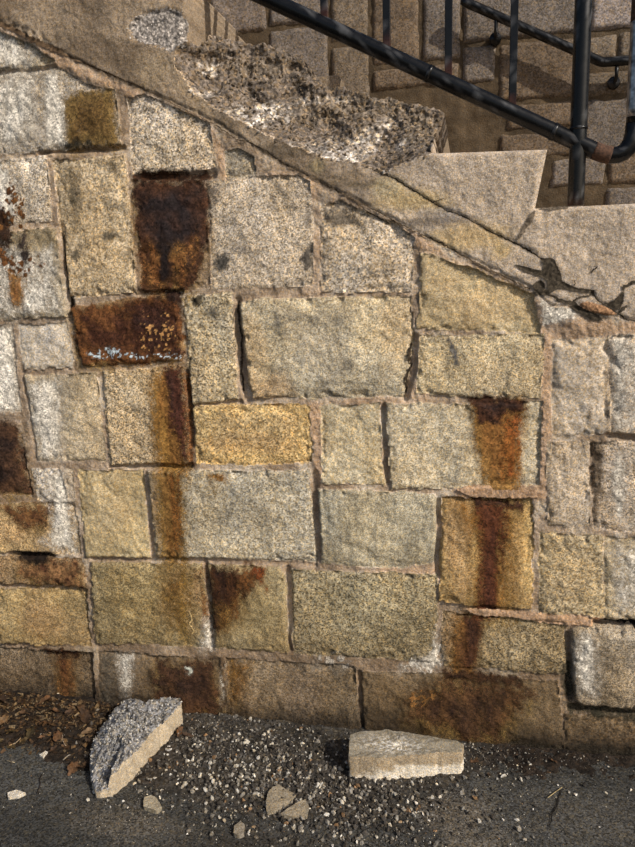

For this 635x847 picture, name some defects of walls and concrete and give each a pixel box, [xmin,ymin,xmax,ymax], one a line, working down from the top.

corrosion [0,182,45,306]
spalling [126,6,448,175]
crack [0,22,635,321]
corrosion [0,421,53,532]
corrosion [70,168,268,644]
corrosion [14,551,86,590]
corrosion [404,392,537,744]